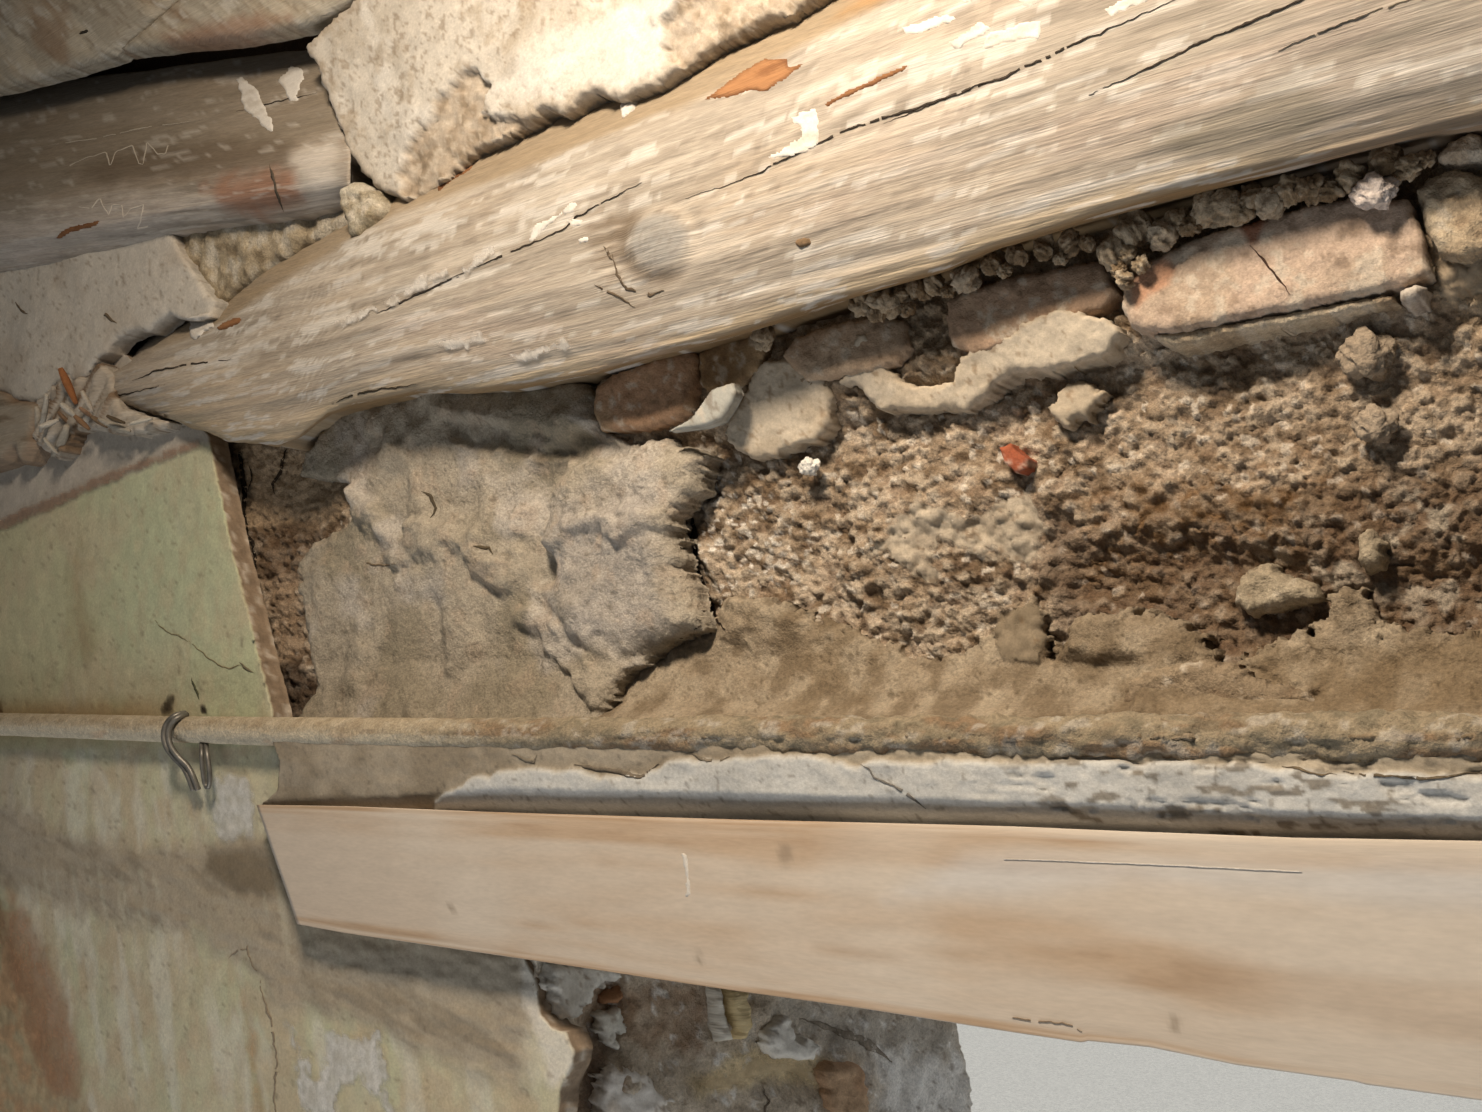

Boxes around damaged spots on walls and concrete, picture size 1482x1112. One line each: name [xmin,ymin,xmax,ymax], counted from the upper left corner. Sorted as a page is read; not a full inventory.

spalling [795,238,811,248]
crack [680,517,725,639]
crack [157,623,254,699]
crack [228,946,278,1112]
peeling [292,1030,393,1112]